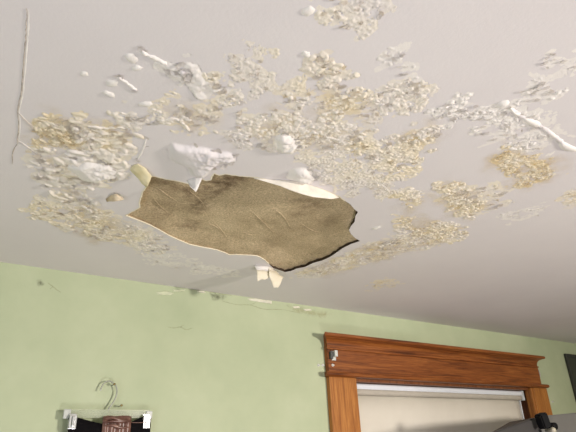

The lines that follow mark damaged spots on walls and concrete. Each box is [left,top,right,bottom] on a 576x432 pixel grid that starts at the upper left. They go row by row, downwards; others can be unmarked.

crack [12,8,37,164]
flaking render [17,39,576,288]
peeling [314,0,397,42]